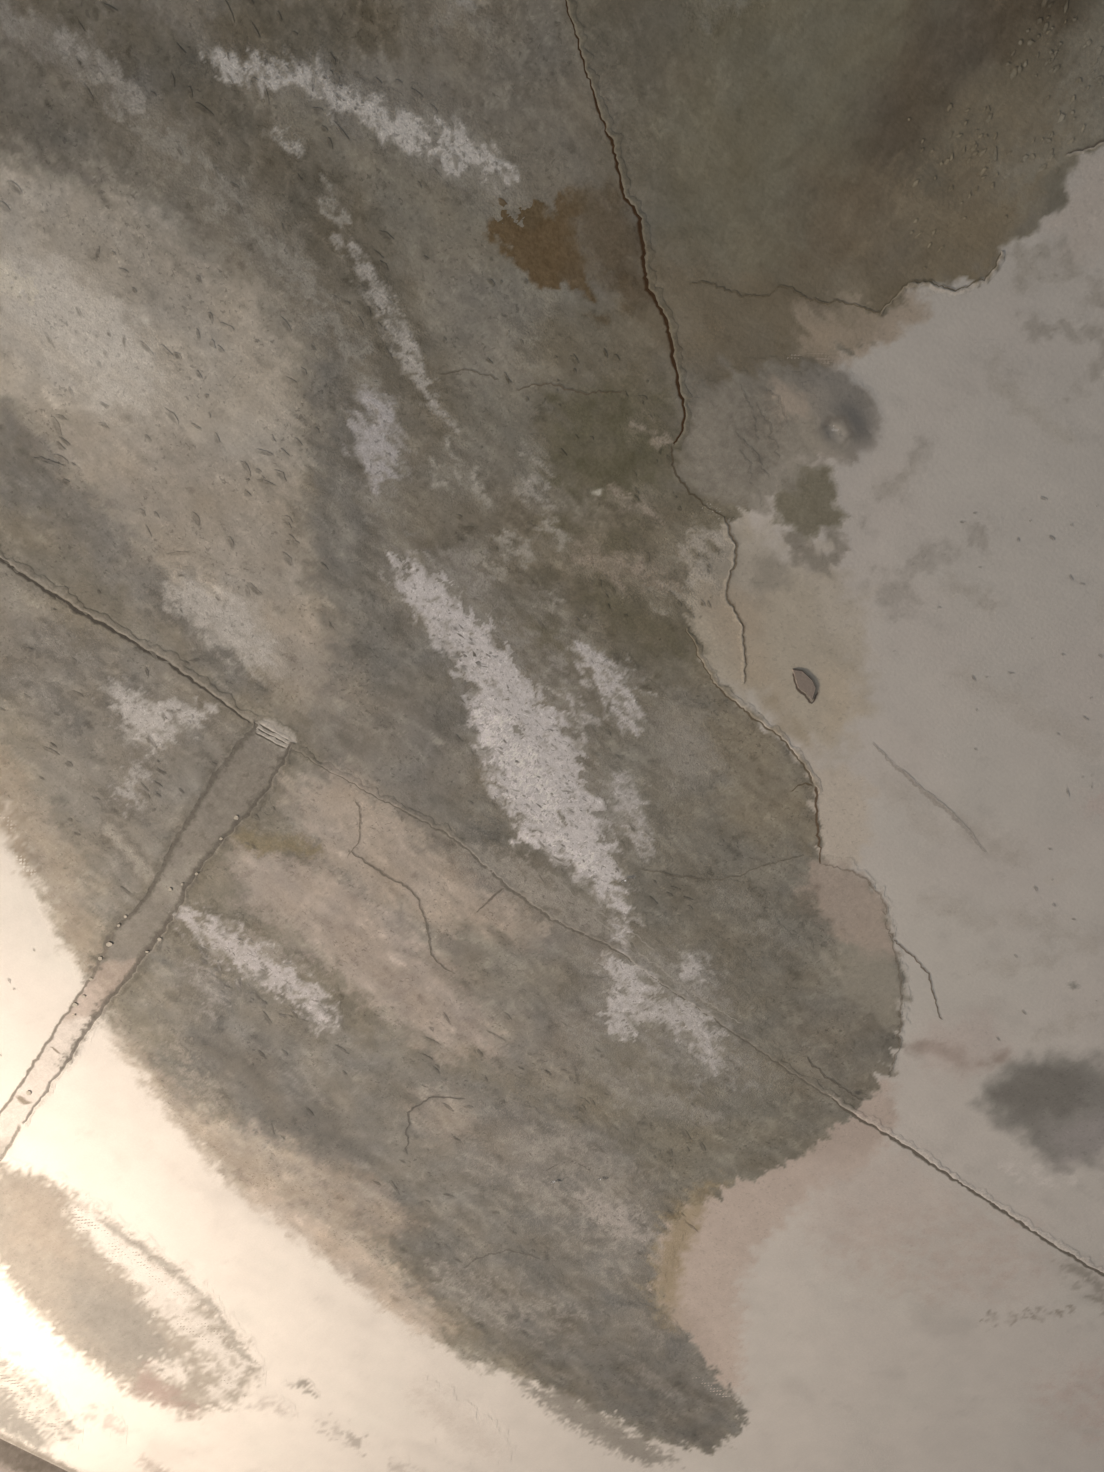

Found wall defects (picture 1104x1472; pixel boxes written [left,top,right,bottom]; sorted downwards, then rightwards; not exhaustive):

corrosion [481,177,639,334]
crack [438,369,624,396]
leakage [588,470,668,536]
leakage [613,396,683,464]
crack [565,0,822,881]
leakage [853,428,944,536]
crack [0,551,258,724]
leakage [0,560,247,982]
crack [292,743,1104,1277]
leakage [0,1152,372,1472]
leakage [397,1375,516,1466]